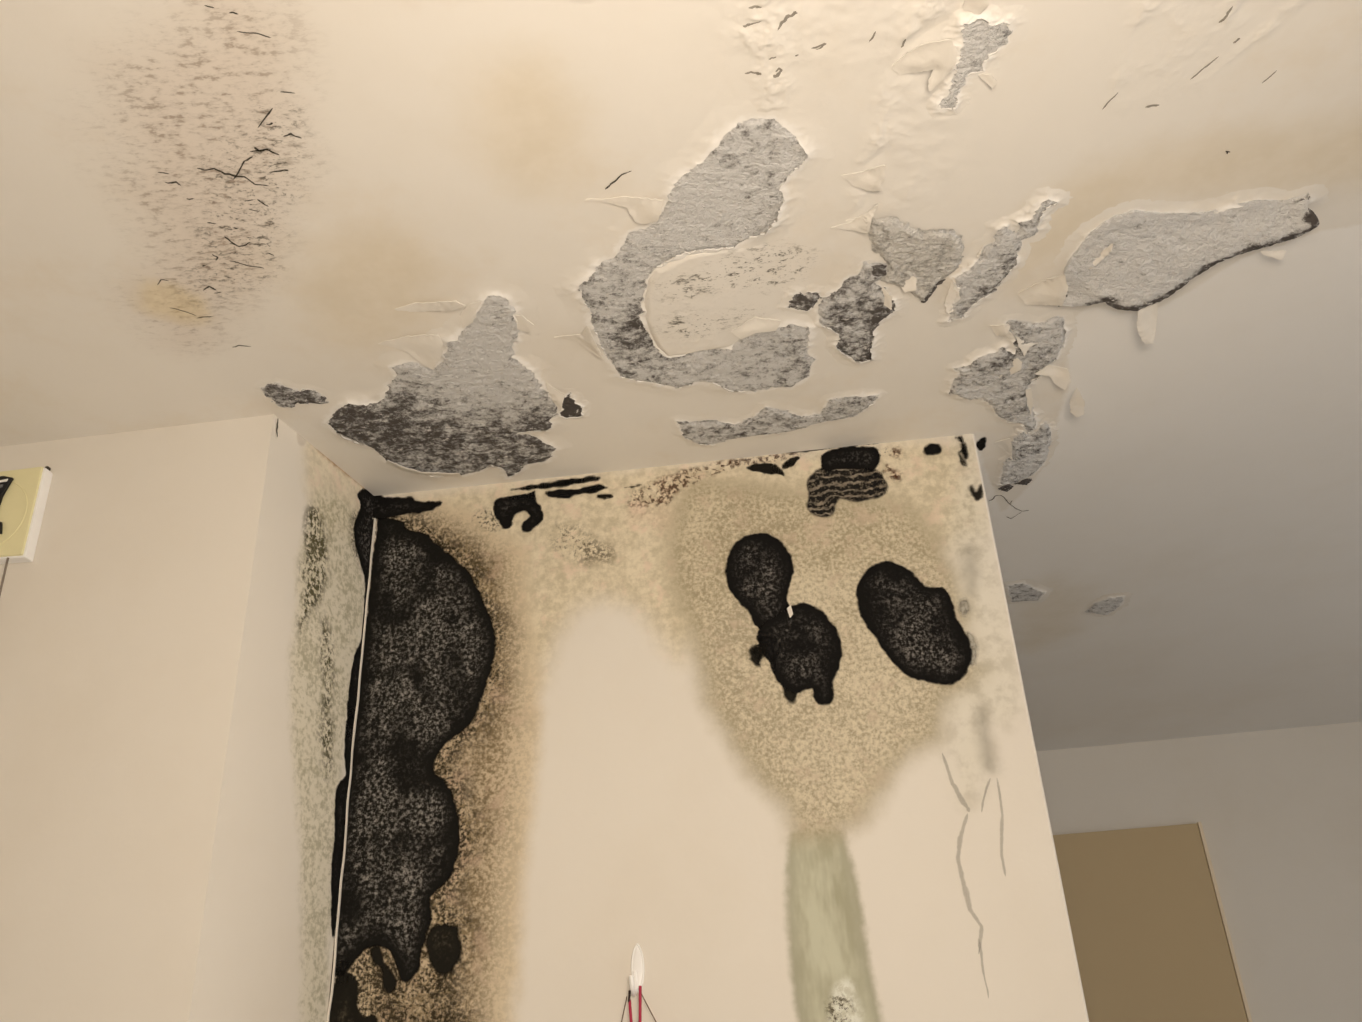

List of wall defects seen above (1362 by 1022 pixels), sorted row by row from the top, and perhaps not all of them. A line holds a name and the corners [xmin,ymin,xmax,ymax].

leakage [888,23,942,74]
peeling [892,0,1031,118]
peeling [252,100,1330,492]
leakage [771,171,917,312]
leakage [520,478,583,490]
leakage [546,484,606,498]
leakage [747,463,784,476]
leakage [924,444,942,455]
leakage [970,485,983,501]
leakage [725,533,842,705]
mould [856,561,977,685]
leakage [269,473,365,1022]